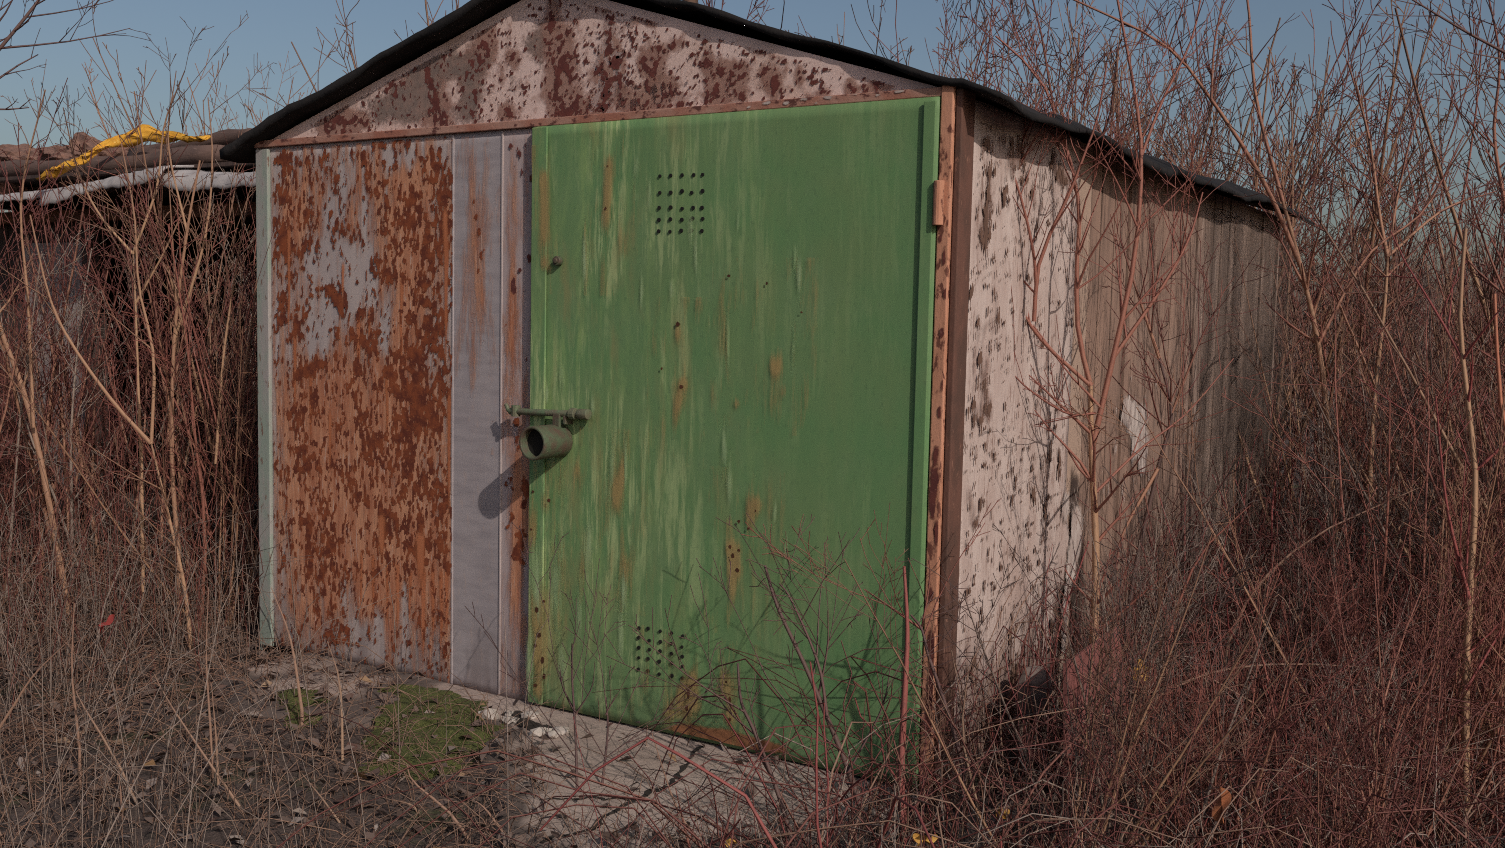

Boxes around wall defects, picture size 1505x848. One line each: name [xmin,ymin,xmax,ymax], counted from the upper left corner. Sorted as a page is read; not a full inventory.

rust [272,136,487,681]
rust [492,143,550,696]
damp [1070,473,1079,522]
damp [1069,541,1084,658]
crack [540,746,703,843]